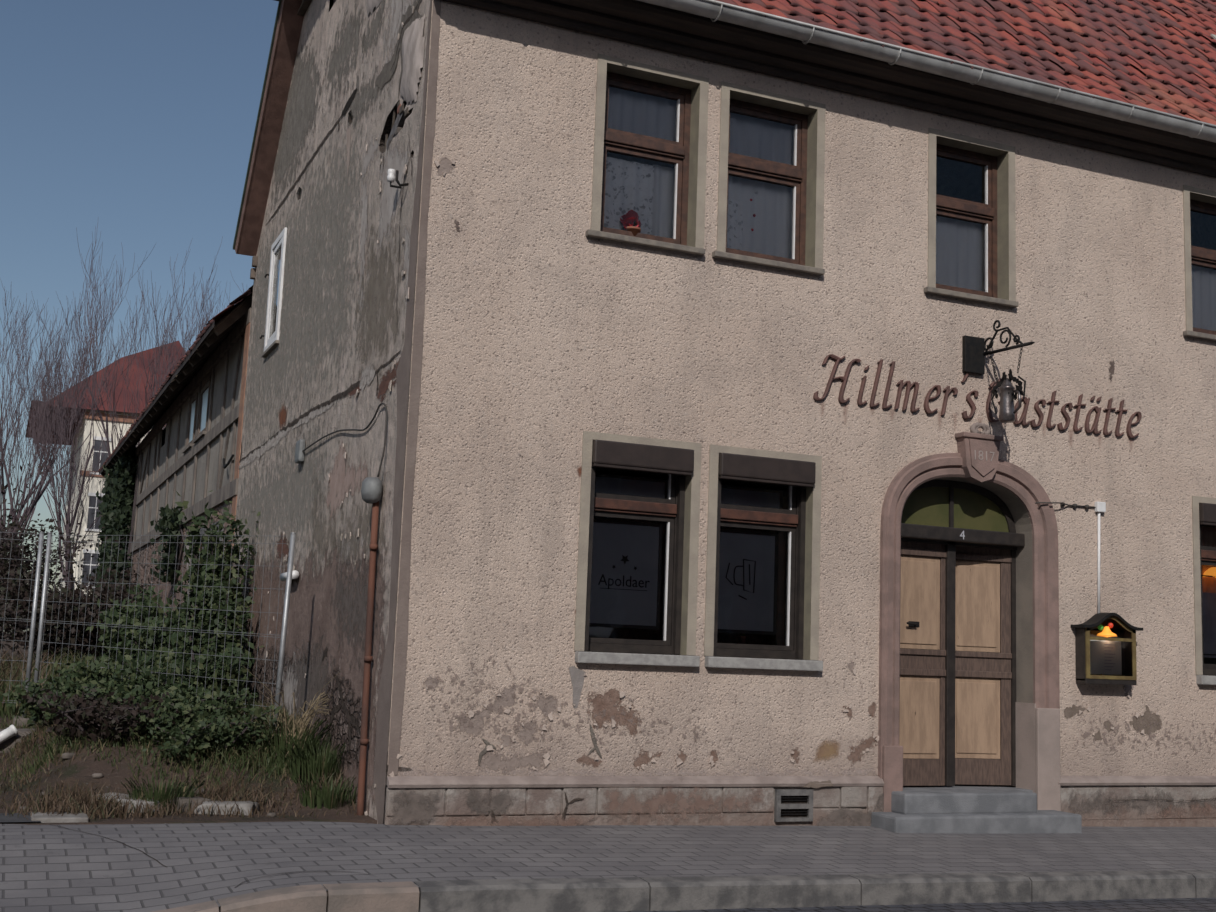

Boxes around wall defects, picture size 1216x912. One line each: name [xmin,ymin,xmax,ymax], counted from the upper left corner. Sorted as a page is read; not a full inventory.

peeling [382,0,414,63]
crack [265,0,423,226]
peeling [377,100,413,305]
crack [239,141,412,468]
flaking render [377,359,400,403]
flaking render [231,529,386,816]
spalling [456,666,687,773]
spalling [848,734,879,764]
spalling [1064,705,1091,718]
spalling [1130,705,1162,734]